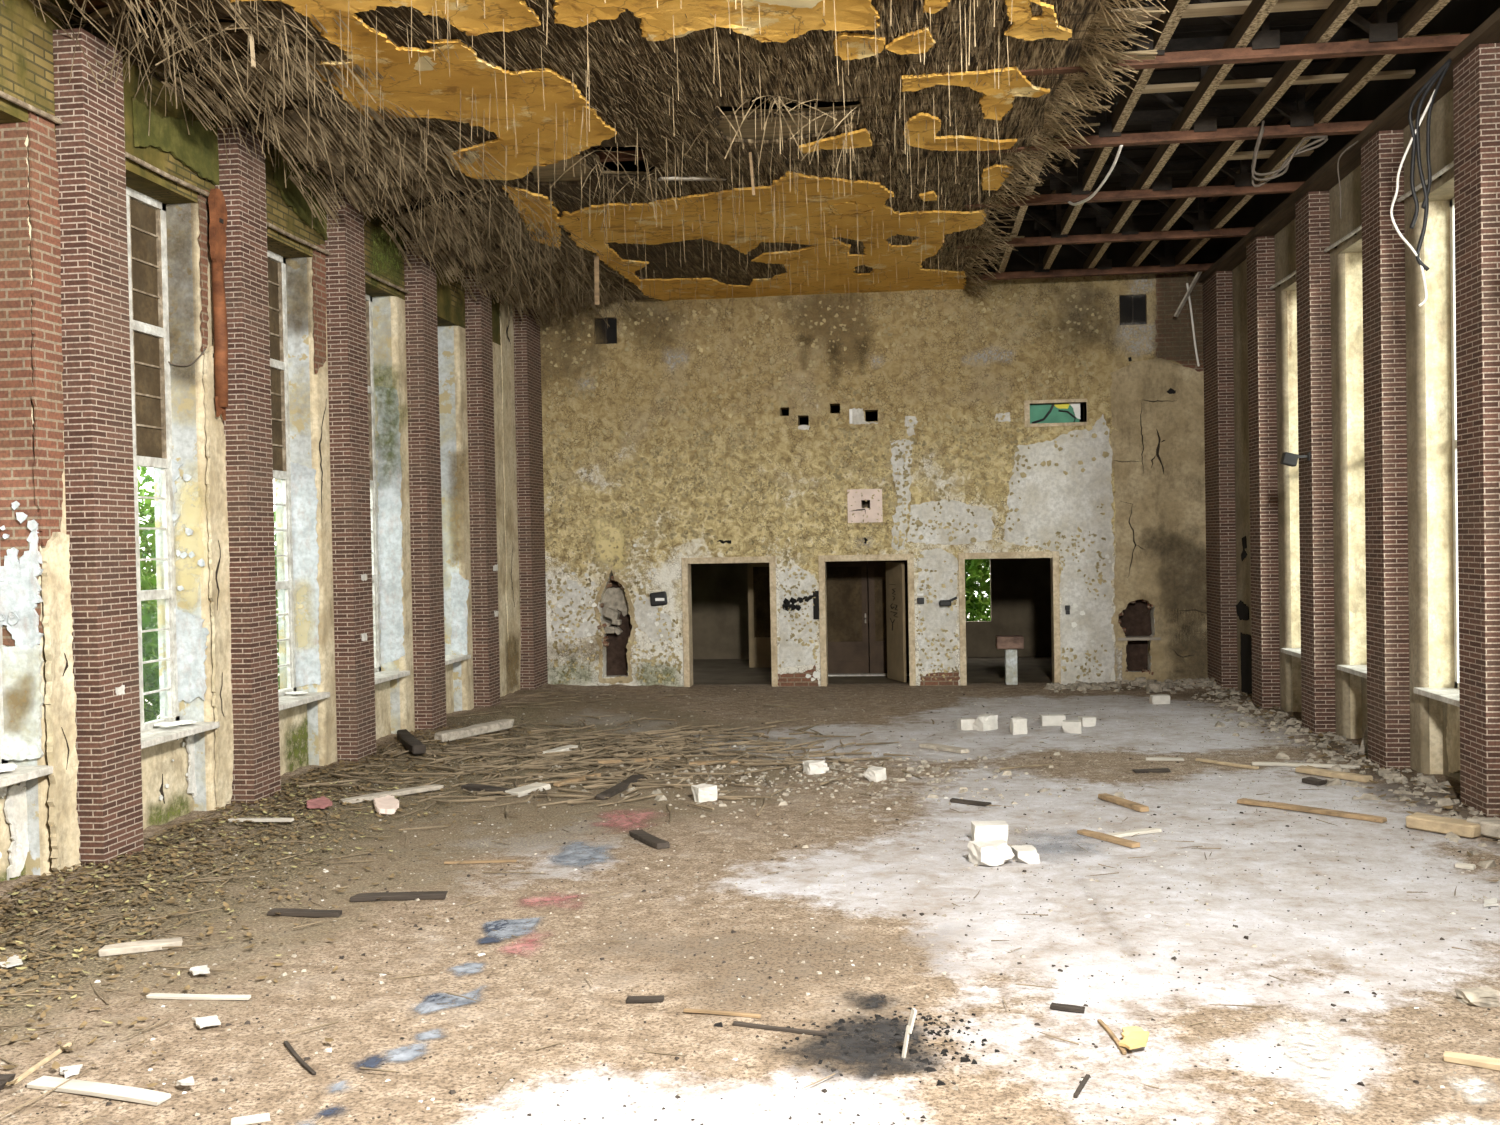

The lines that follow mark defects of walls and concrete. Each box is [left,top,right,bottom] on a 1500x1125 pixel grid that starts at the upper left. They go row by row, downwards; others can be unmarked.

spalling [754,0,822,8]
spalling [414,56,437,71]
water stain [166,203,196,381]
water stain [286,257,309,329]
peeling [273,145,328,374]
spalling [605,238,812,286]
spalling [834,237,873,273]
spalling [886,234,919,245]
crack [1113,400,1177,474]
flaking render [0,110,65,880]
peeling [542,271,1208,687]
crack [1121,501,1145,576]